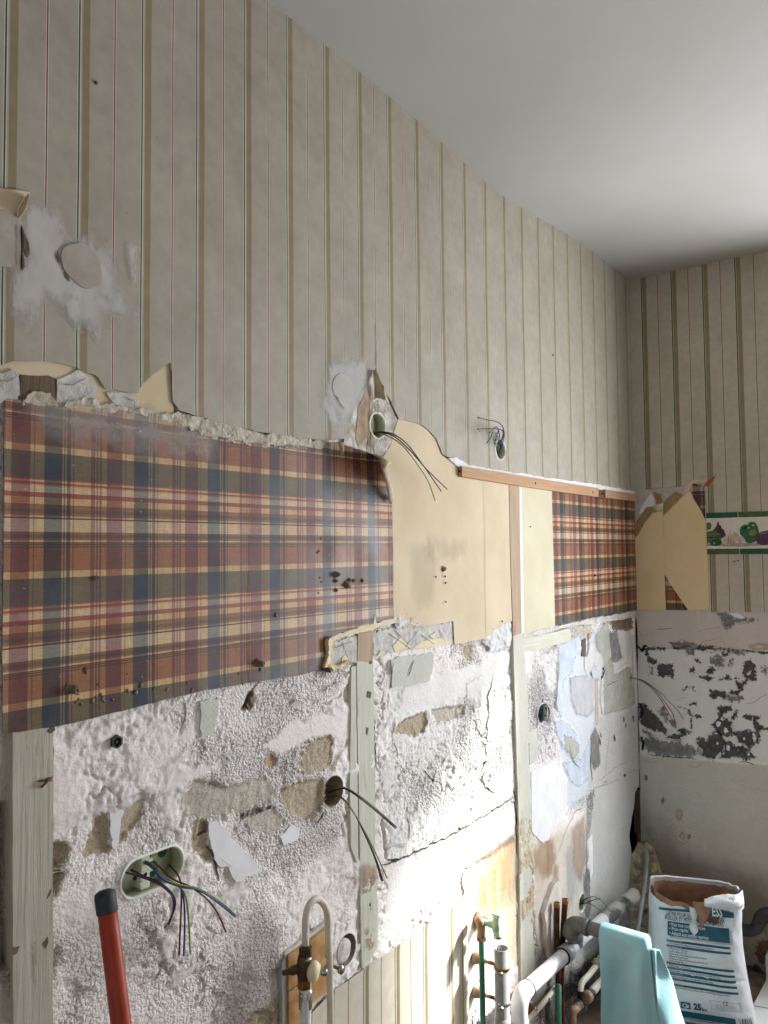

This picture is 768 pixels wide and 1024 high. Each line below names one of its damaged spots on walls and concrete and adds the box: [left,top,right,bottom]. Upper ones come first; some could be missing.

peeling [22,230,30,270]
flaking render [0,369,139,409]
spalling [241,688,254,711]
spalling [391,705,466,737]
peeling [554,635,601,770]
peeling [609,618,768,761]
spalling [53,789,150,896]
spalling [181,734,335,882]
crack [376,678,518,867]
peeling [530,761,568,843]
spalling [245,954,287,1024]